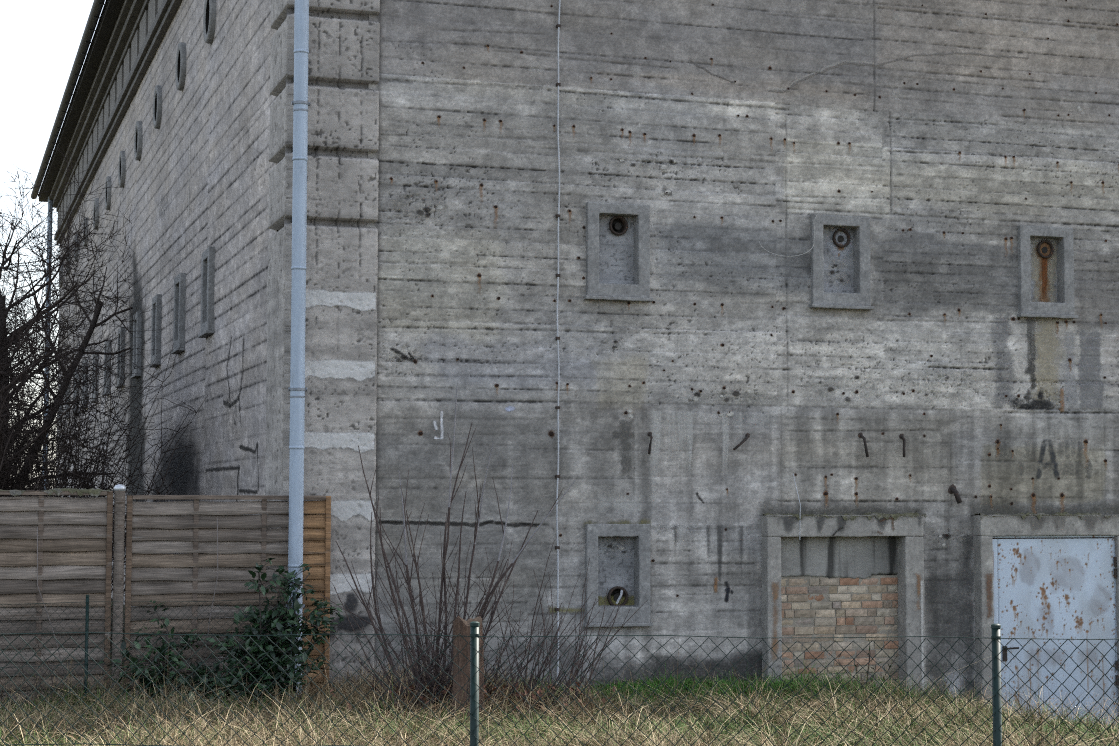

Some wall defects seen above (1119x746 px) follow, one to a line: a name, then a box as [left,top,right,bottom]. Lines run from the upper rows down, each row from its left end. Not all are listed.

rust [1032,243,1056,303]
water stain [1024,319,1103,409]